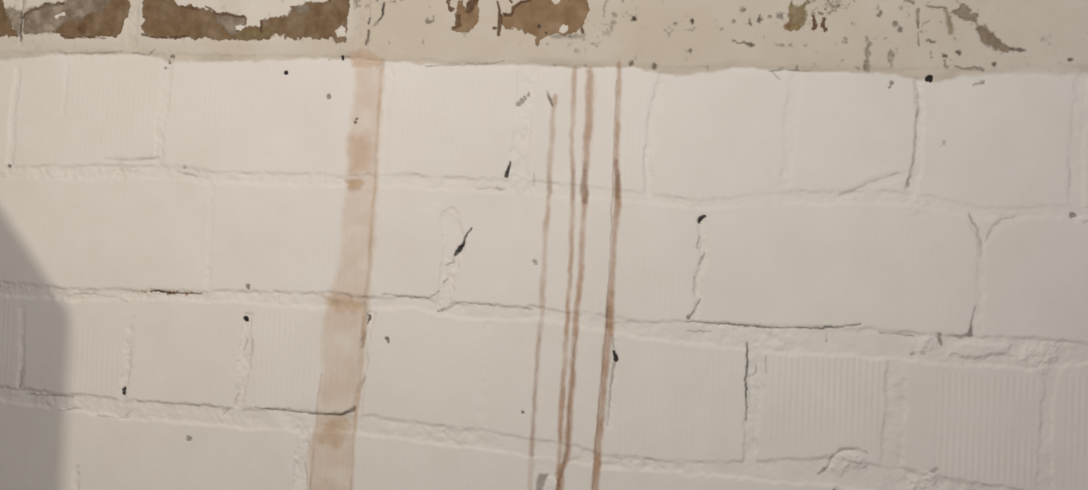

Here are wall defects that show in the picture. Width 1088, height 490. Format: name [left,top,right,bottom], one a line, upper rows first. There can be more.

peeling [0,0,350,43]
peeling [446,0,479,33]
peeling [493,0,590,46]
peeling [784,1,827,32]
spalling [929,4,1025,52]
crack [454,228,472,256]